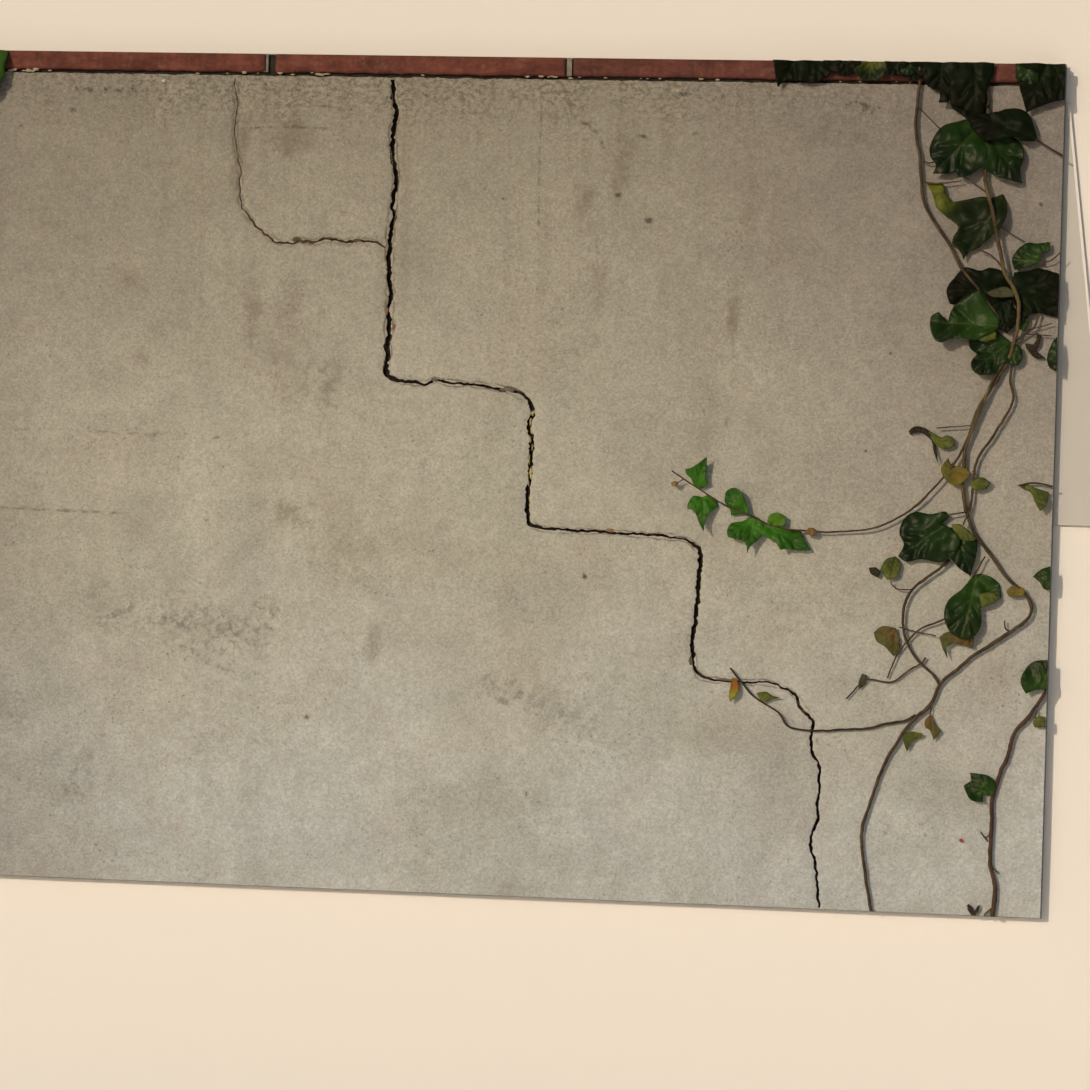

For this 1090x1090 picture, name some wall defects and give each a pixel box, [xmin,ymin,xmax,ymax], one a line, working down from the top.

crack [234,78,821,908]